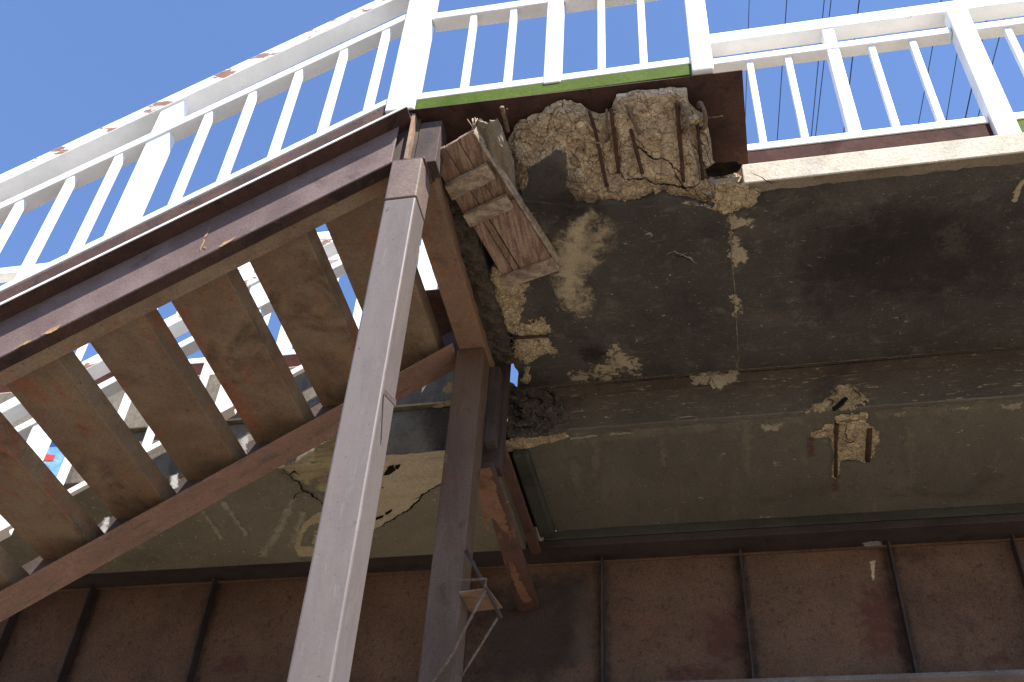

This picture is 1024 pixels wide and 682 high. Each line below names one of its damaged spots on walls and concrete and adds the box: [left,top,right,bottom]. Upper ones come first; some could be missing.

spalling [499,87,761,318]
crack [620,143,701,191]
spalling [441,176,644,452]
peeling [689,369,740,391]
spalling [805,383,880,479]
crack [281,469,323,505]
peeling [374,450,445,529]
corrosion [478,467,513,539]